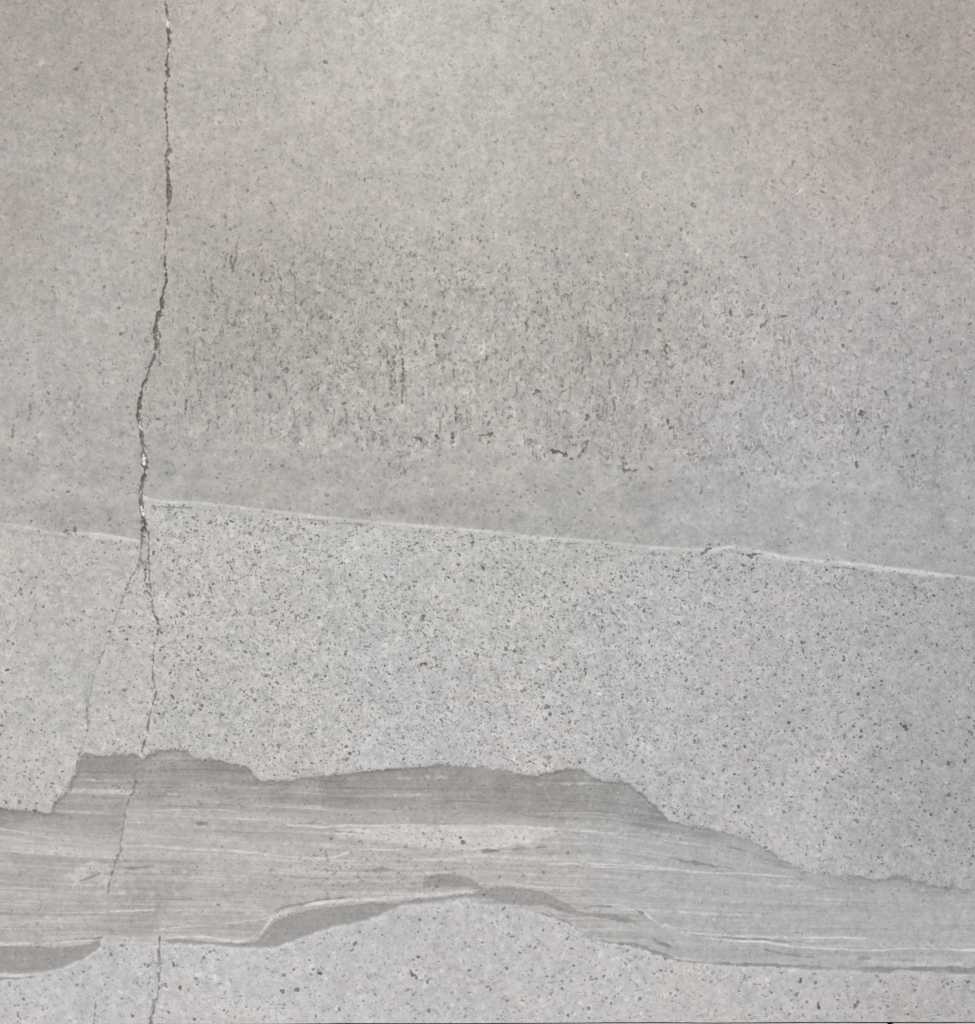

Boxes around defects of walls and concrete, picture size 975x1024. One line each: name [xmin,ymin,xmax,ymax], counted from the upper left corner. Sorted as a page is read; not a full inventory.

crack [76,0,173,895]
crack [149,936,163,1024]